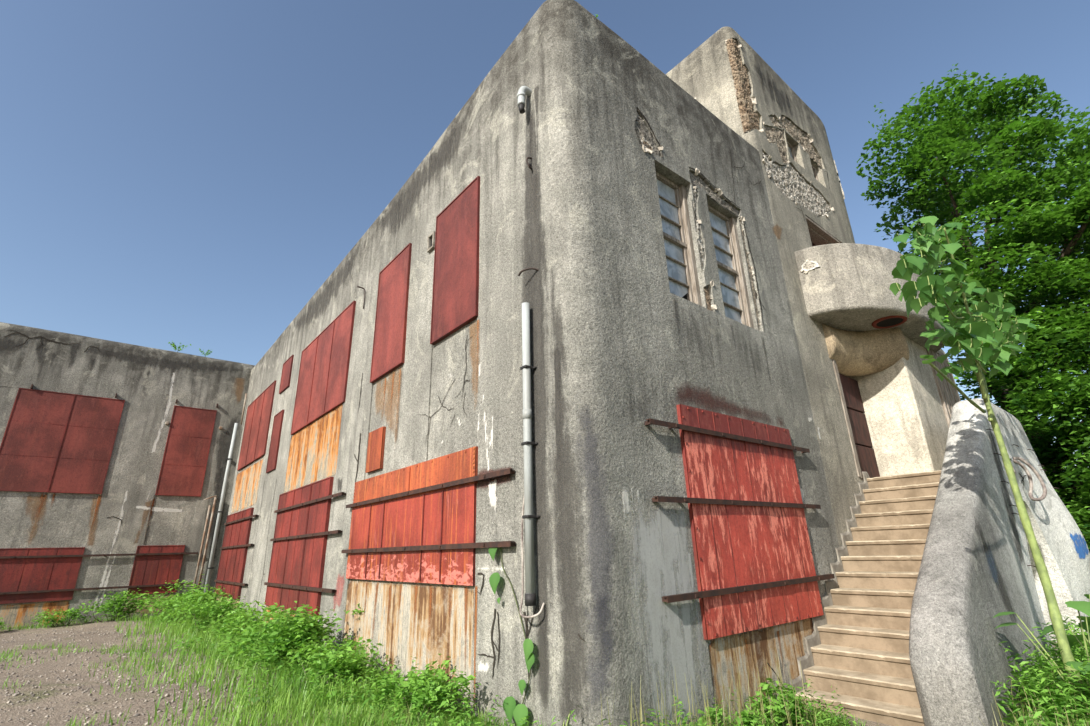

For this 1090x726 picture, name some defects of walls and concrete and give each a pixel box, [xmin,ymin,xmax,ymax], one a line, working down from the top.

spalling [635,113,663,156]
spalling [725,39,845,217]
spalling [689,168,760,331]
crack [4,330,100,352]
damp [91,347,240,374]
crack [418,337,471,443]
damp [523,86,611,719]
rust [89,496,101,544]
rust [342,580,477,713]
rust [710,618,814,726]